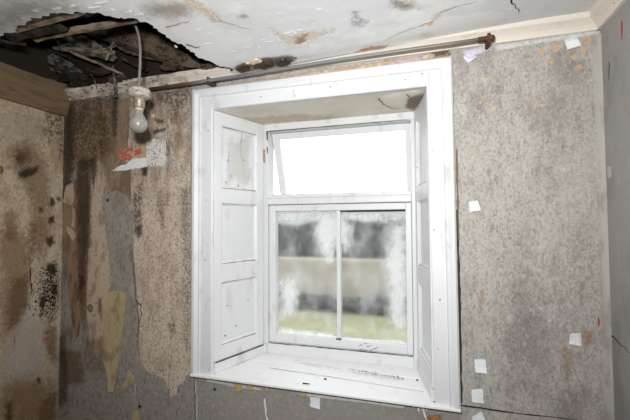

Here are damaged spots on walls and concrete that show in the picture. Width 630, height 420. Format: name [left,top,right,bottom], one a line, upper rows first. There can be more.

peeling [244,29,334,50]
peeling [63,182,76,242]
damp [46,97,117,300]
damp [3,259,60,382]
peeling [97,290,126,392]